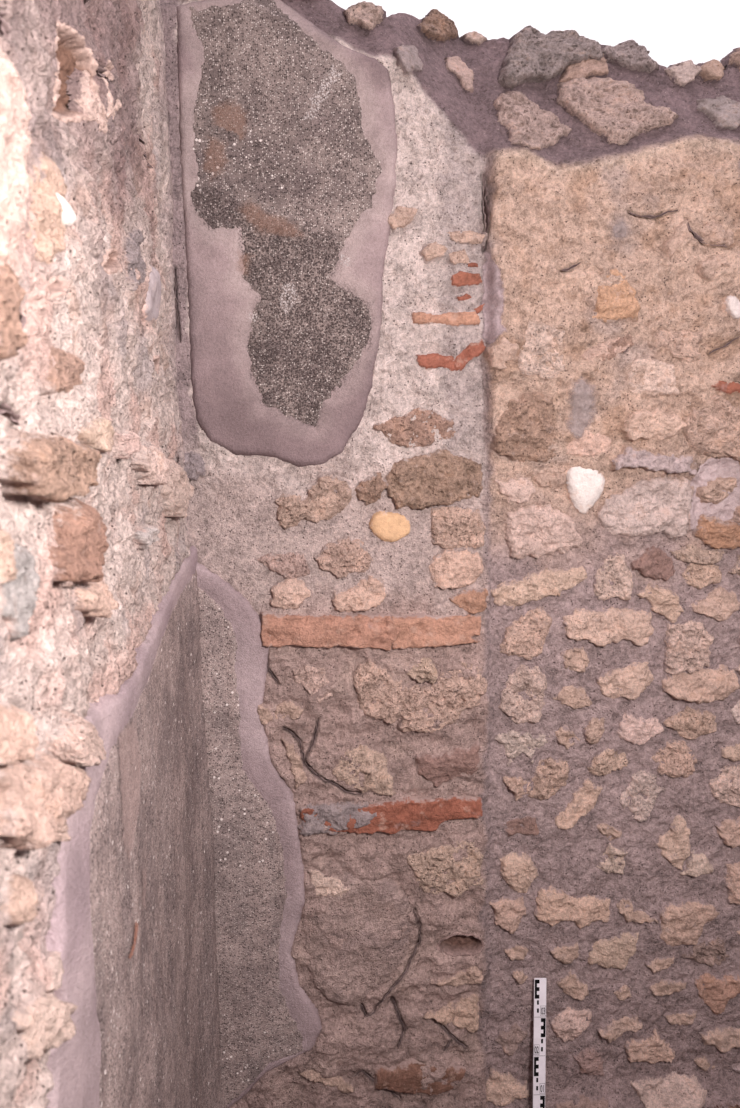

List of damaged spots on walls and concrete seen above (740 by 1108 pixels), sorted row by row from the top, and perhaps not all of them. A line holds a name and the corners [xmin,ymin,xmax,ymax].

crack [283,720,361,795]
crack [361,909,422,1049]
crack [439,1022,467,1051]